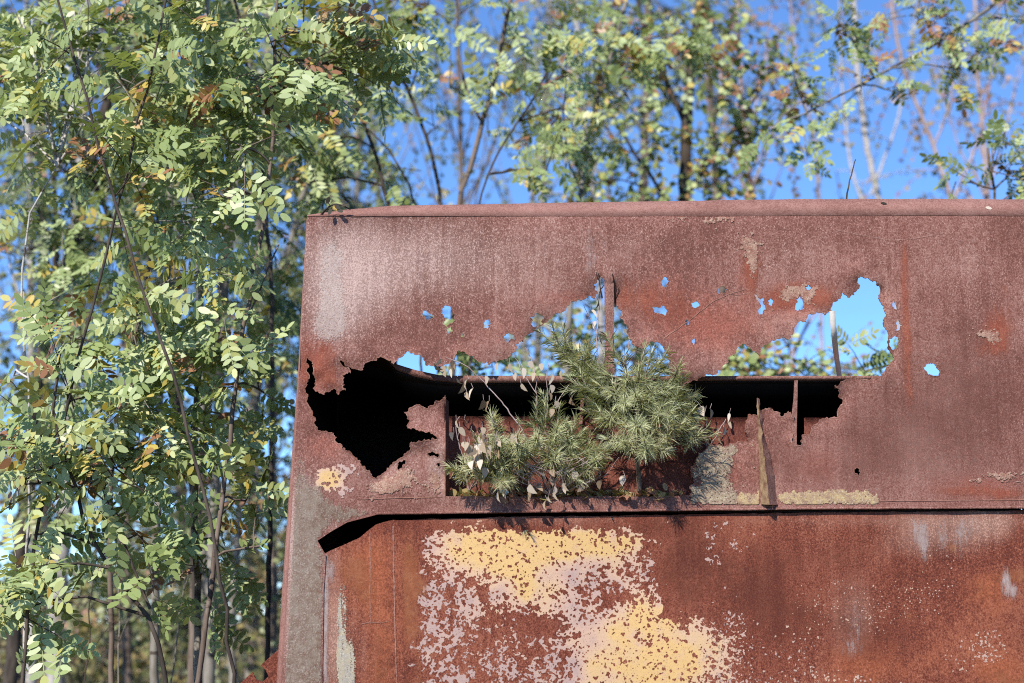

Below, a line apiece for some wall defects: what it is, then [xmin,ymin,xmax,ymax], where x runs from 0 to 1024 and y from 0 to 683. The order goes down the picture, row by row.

corrosion [745,256,834,310]
corrosion [301,343,338,386]
peeling [313,463,374,501]
peeling [407,518,960,683]
peeling [945,630,1007,672]